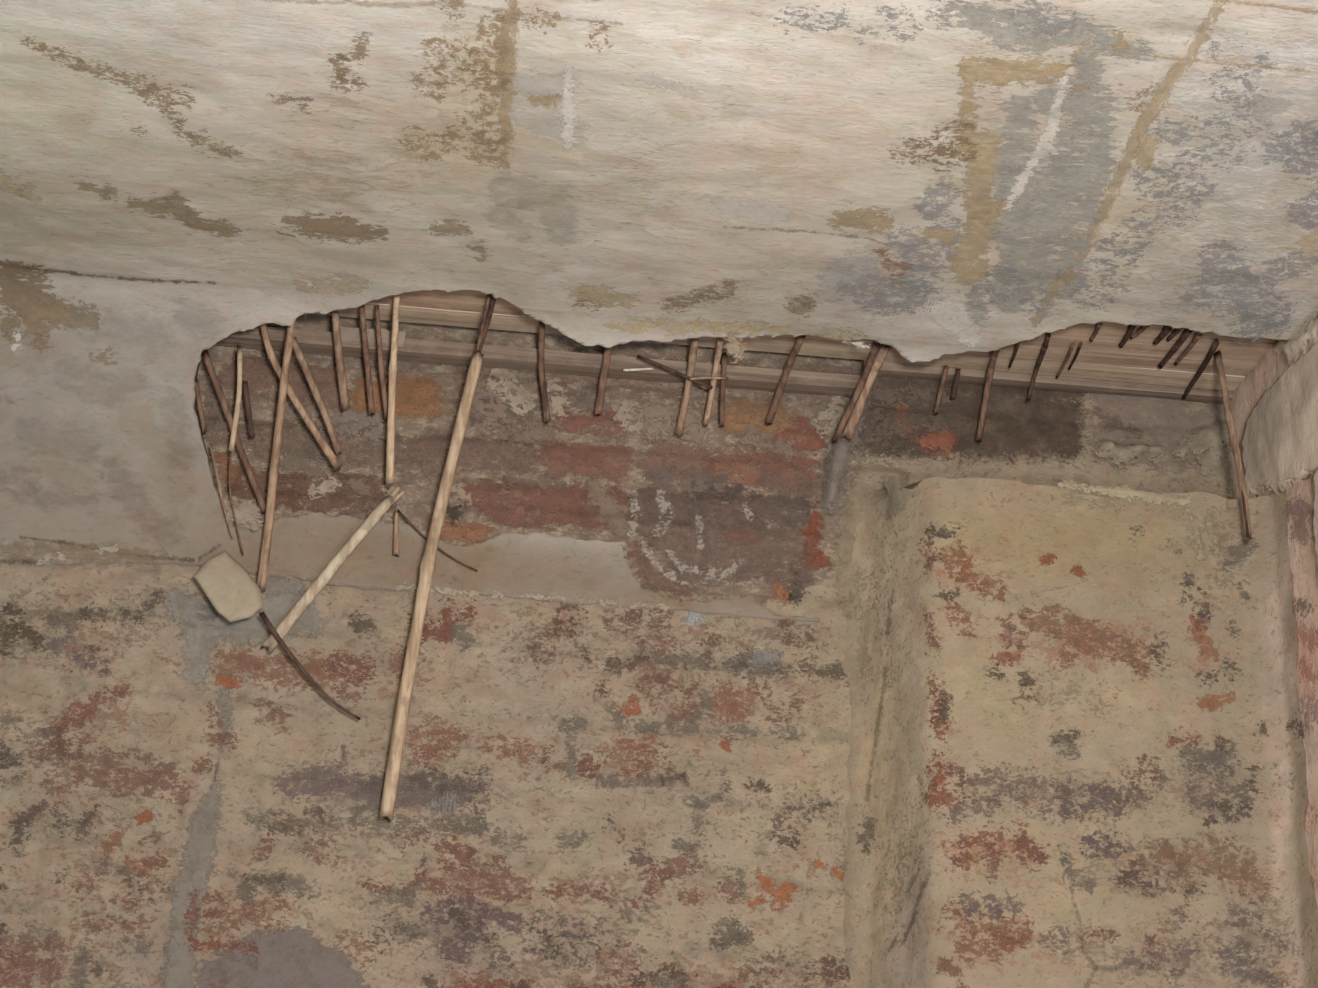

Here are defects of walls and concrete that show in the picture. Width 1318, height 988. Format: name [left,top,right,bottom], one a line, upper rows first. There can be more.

damp [394,0,561,169]
damp [586,21,613,54]
damp [1032,0,1228,326]
spalling [197,345,865,753]
peeling [407,710,672,782]